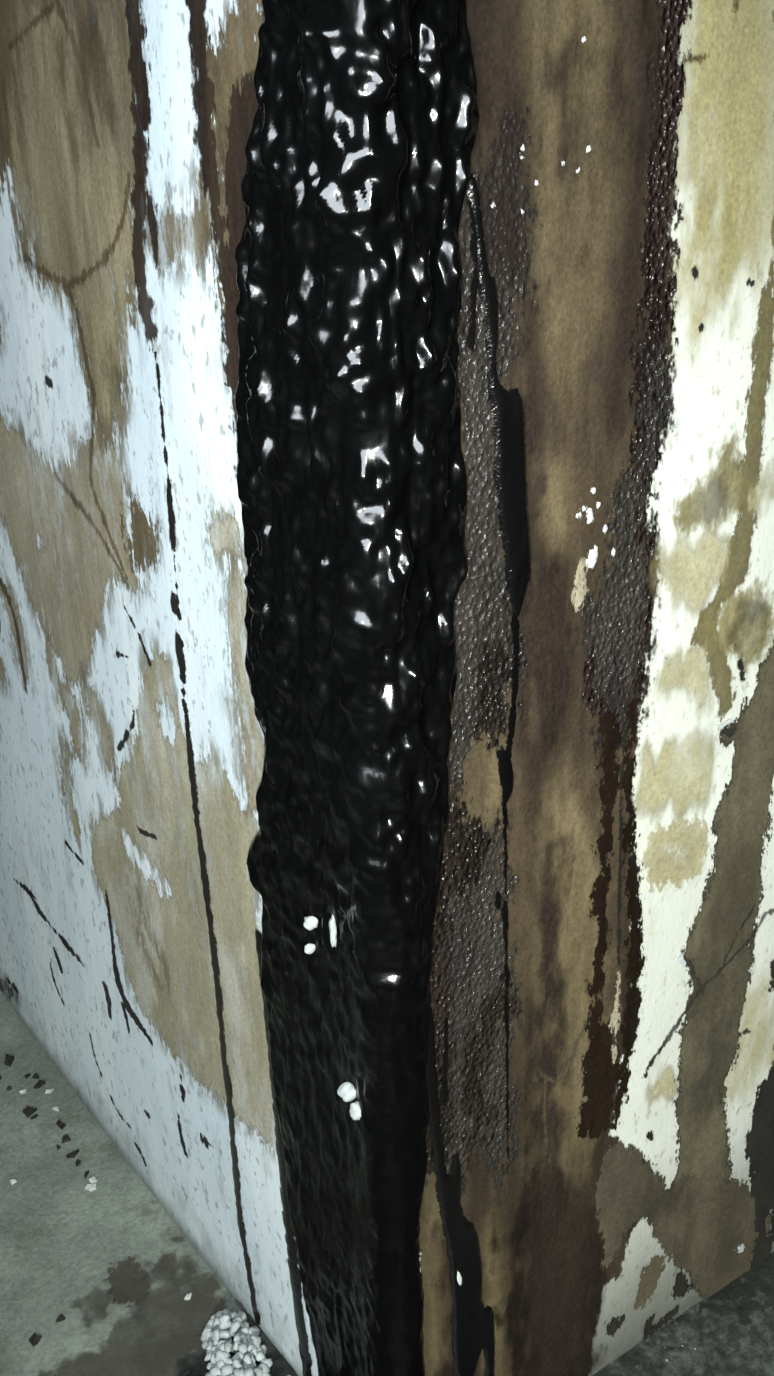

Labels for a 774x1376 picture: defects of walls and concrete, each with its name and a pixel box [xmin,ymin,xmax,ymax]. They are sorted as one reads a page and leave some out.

crack [14,840,214,1167]
leakage [39,1238,224,1376]
leakage [0,0,274,1147]
leakage [419,0,774,1376]
peeling [595,640,774,1340]